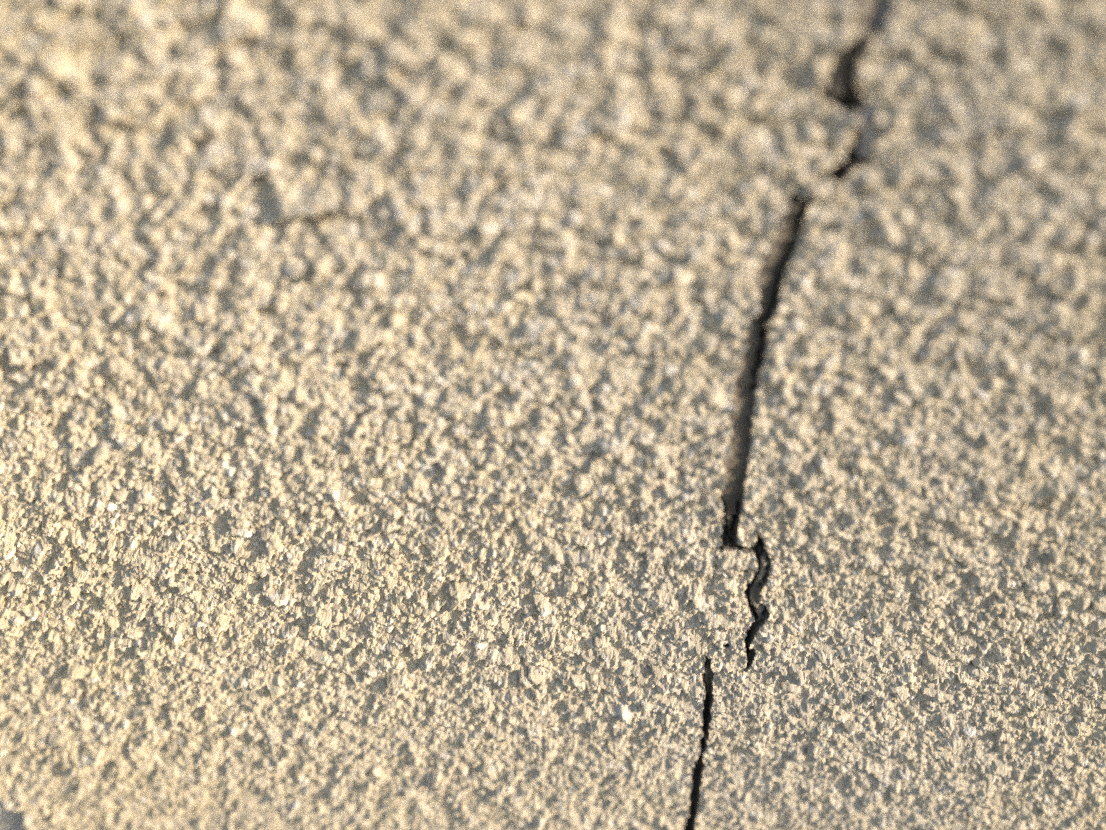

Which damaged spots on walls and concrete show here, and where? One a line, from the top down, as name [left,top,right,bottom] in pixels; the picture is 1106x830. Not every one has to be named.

spalling [0,799,27,830]
crack [684,0,896,830]